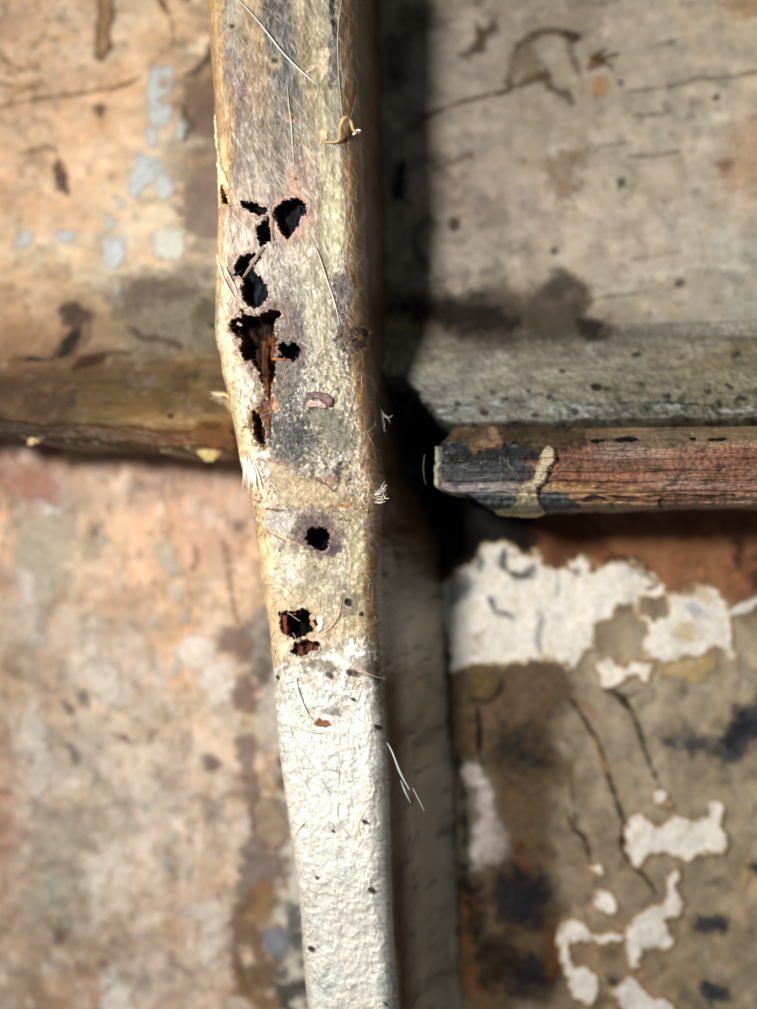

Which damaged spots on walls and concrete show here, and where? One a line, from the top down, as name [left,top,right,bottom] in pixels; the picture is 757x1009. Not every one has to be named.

crack [412,92,497,127]
damp [328,273,370,354]
damp [386,269,640,342]
peeling [441,541,757,689]
crack [608,690,660,790]
peeling [459,762,512,871]
damp [446,660,571,1009]
crack [567,697,655,893]
peeling [555,789,729,1009]